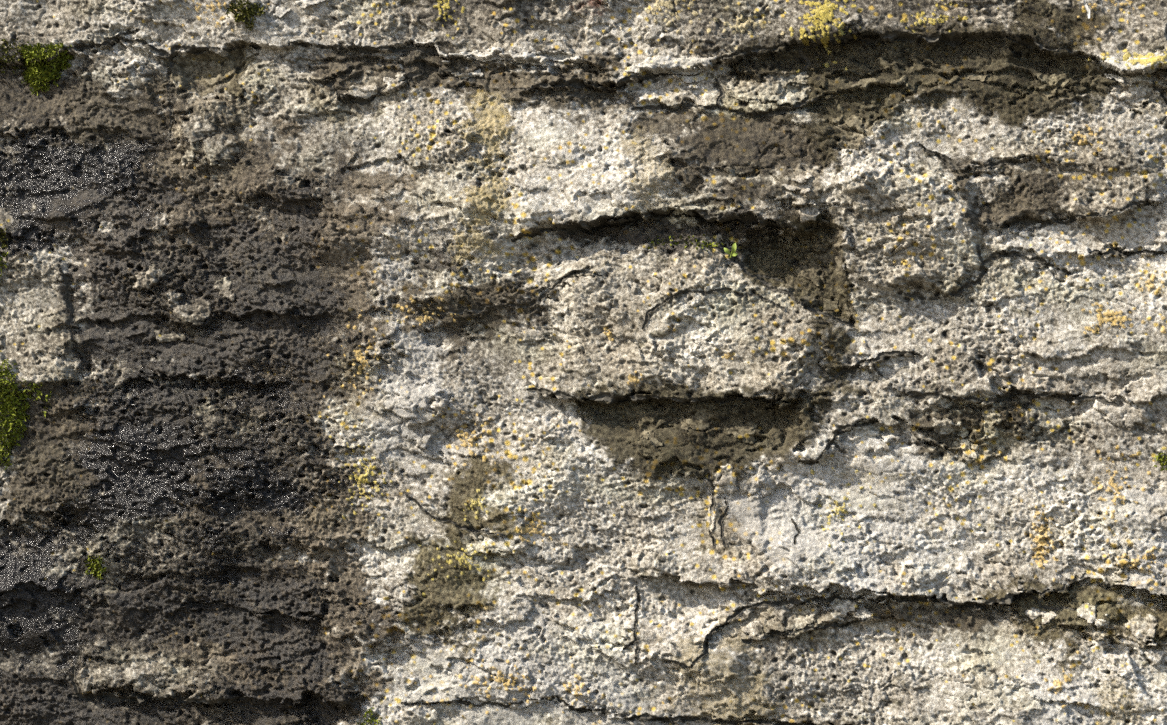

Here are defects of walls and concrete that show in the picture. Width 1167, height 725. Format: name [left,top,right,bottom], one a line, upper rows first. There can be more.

water stain [0,52,652,725]
crack [622,582,640,665]
crack [667,584,1076,668]